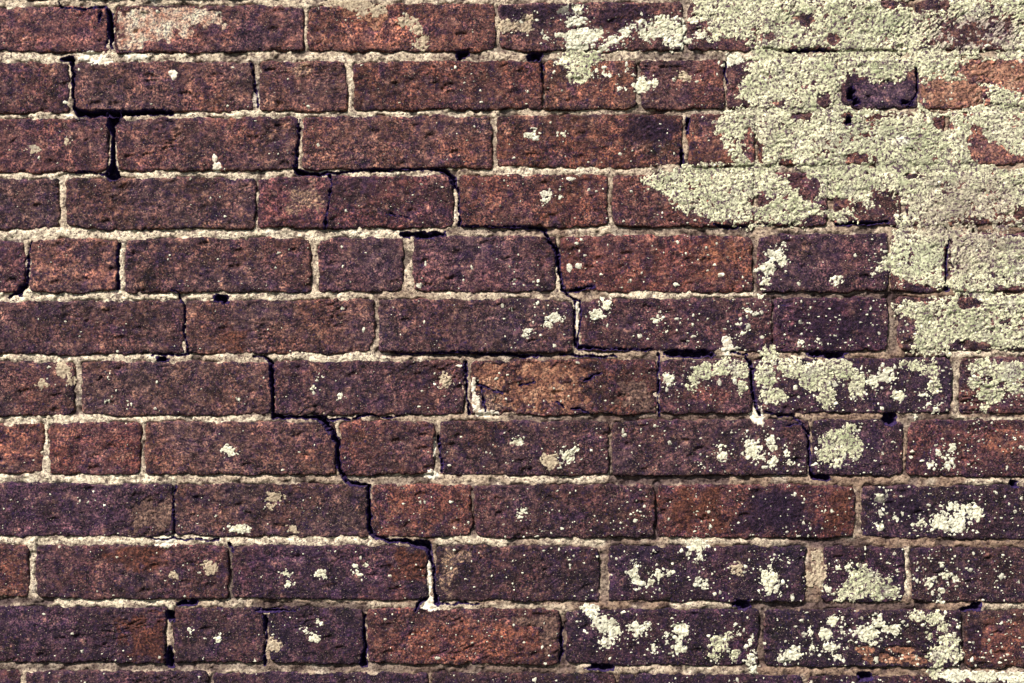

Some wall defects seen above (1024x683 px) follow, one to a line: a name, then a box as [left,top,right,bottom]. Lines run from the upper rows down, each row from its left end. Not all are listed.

crack [60,55,174,182]
crack [292,119,661,417]
crack [252,355,482,613]